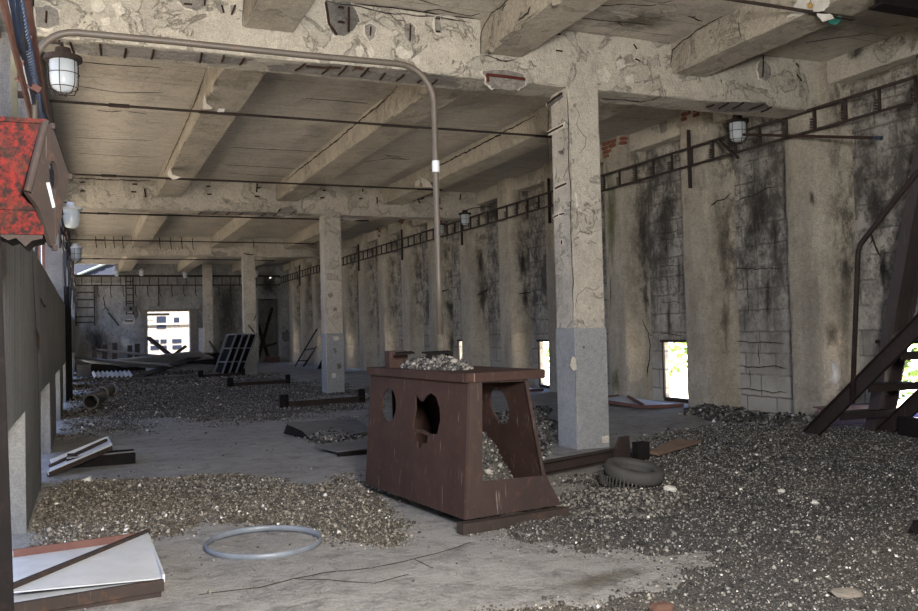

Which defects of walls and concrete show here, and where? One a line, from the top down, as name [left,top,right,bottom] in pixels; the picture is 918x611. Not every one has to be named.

spalling [33,0,61,32]
peeling [91,0,126,27]
spalling [177,0,237,16]
spalling [58,40,252,65]
spalling [267,0,461,87]
spalling [480,68,527,91]
flaking render [602,137,628,158]